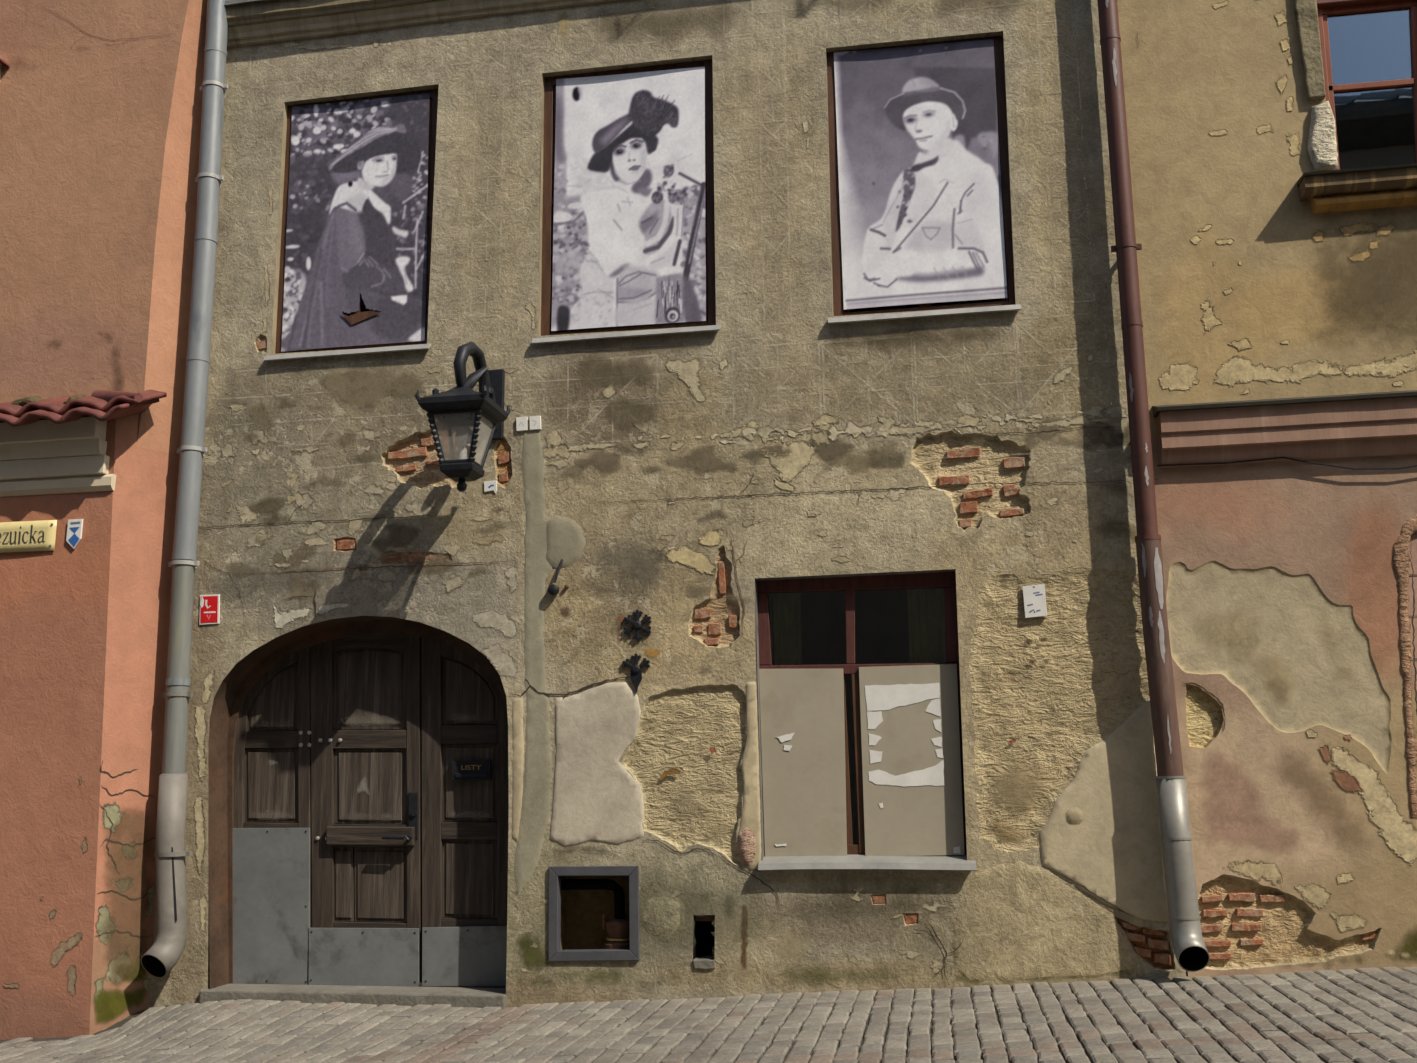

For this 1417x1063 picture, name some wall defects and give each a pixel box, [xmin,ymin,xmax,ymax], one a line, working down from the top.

peeling [1159,338,1417,394]
crack [97,761,155,938]
damp [110,815,147,978]
spalling [224,421,513,592]
flaking render [472,609,520,678]
crack [512,677,627,699]
spalling [622,668,747,868]
spalling [651,528,752,648]
crack [642,839,781,910]
spalling [542,373,1134,546]
spalling [969,521,1417,865]
spalling [1198,858,1381,970]